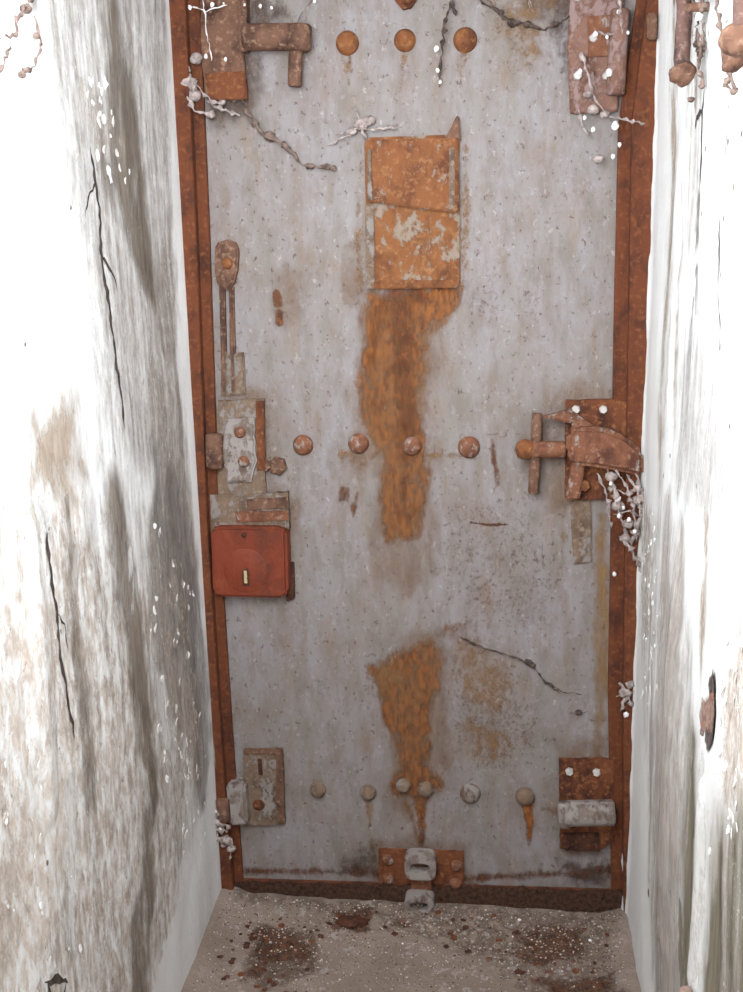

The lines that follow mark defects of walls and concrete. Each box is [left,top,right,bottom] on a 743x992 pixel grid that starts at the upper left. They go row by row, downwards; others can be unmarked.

rust [250,0,285,23]
crack [85,149,125,427]
water stain [661,93,682,377]
water stain [34,400,85,526]
rust [356,286,463,543]
crack [45,516,75,739]
water stain [109,475,176,992]
rust [368,640,443,846]
rust [522,804,556,840]
water stain [650,516,743,992]
spalling [699,630,743,794]
peeling [726,801,738,840]